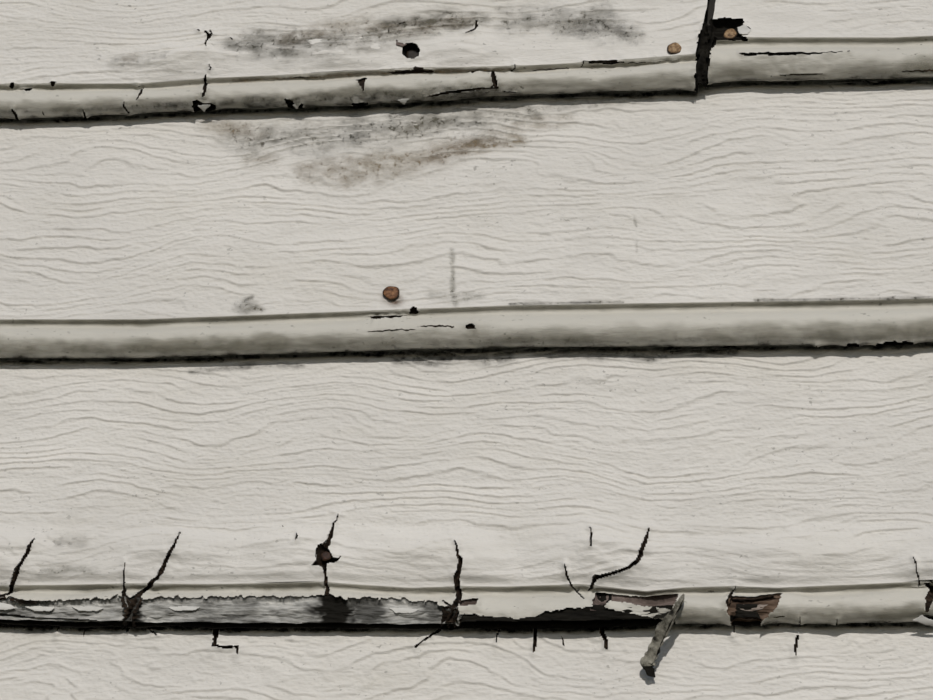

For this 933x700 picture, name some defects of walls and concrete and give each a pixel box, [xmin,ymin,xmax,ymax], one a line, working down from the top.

leakage [228,11,470,56]
crack [0,539,37,604]
crack [121,532,181,635]
crack [283,520,341,596]
crack [415,541,478,648]
spalling [440,592,678,627]
crack [564,529,649,599]
spalling [726,586,782,623]
crack [913,558,933,626]